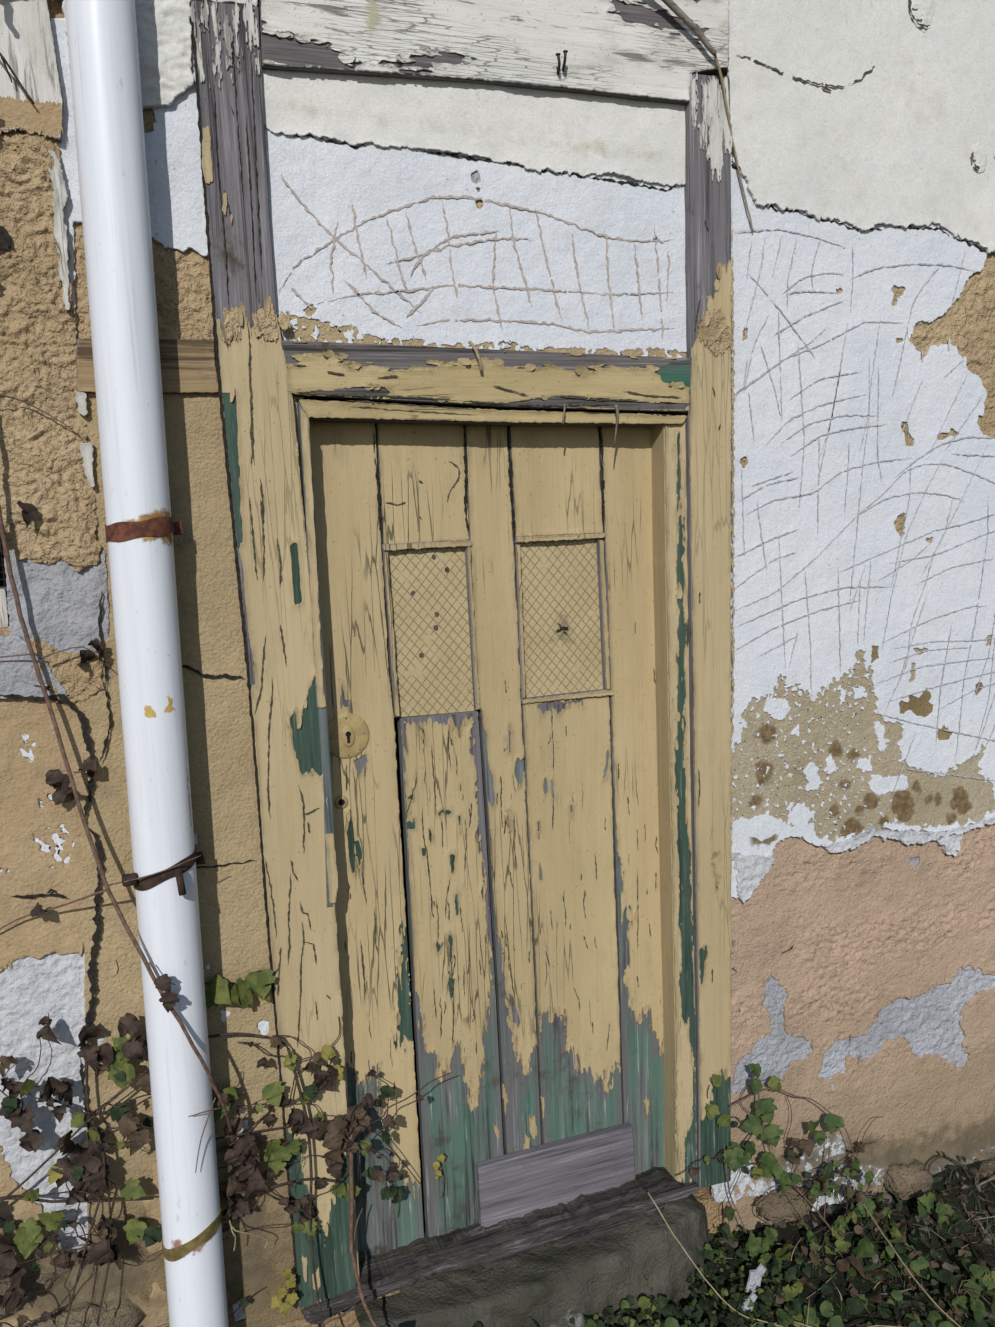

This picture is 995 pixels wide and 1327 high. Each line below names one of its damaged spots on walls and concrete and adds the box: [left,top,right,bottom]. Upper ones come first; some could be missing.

peeling [46,151,91,339]
peeling [152,0,731,411]
peeling [75,391,88,416]
peeling [80,442,95,487]
rust [127,509,172,543]
peeling [290,543,302,605]
flaking render [896,253,995,438]
peeling [290,677,322,776]
crack [0,591,113,1130]
flaking render [674,432,995,1211]
peeling [0,943,88,1254]
peeling [287,712,664,1309]